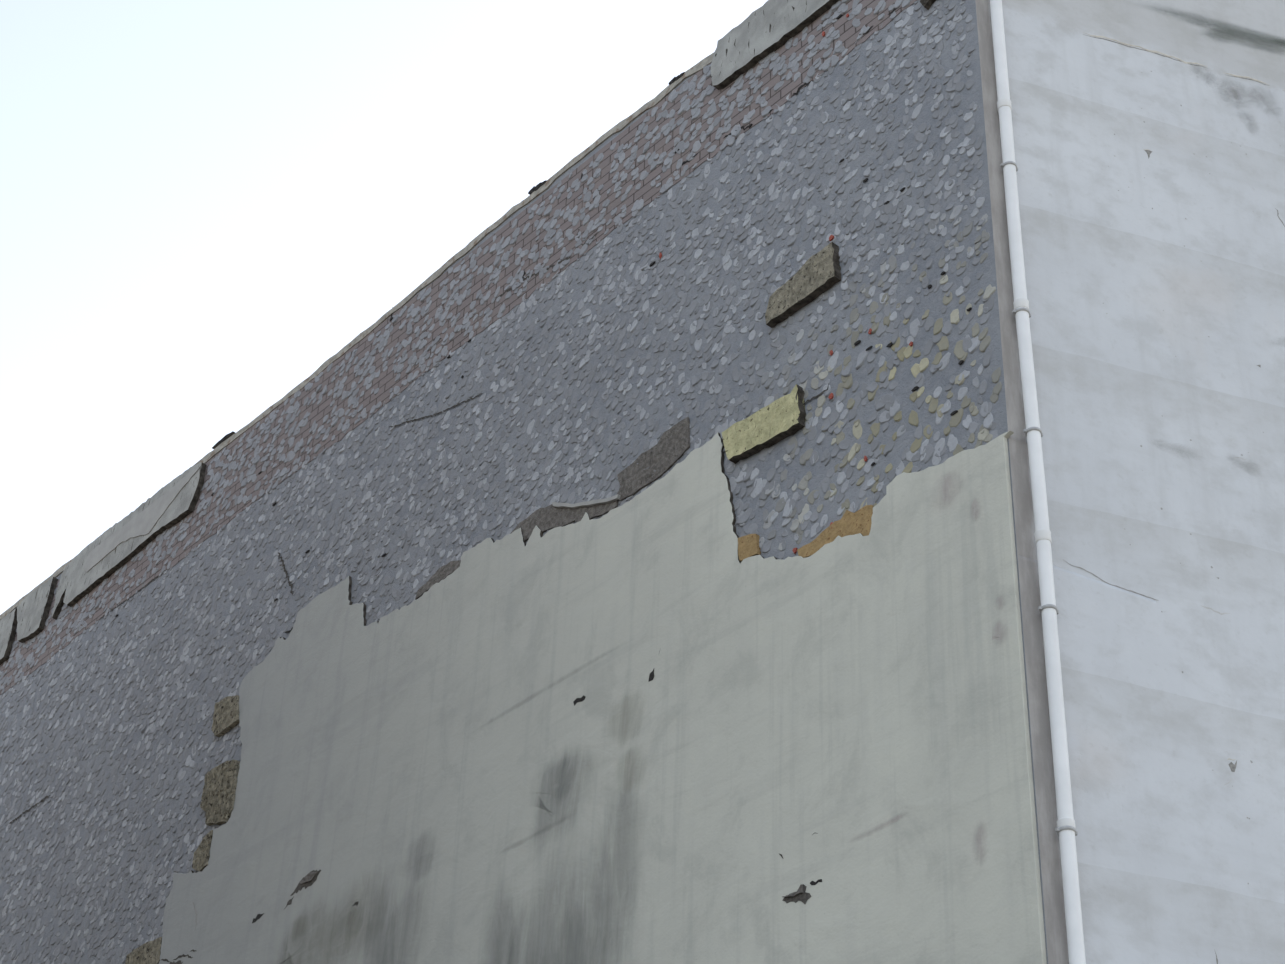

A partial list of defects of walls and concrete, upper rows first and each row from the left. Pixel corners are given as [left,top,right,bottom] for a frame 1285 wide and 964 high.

peeling [0,0,1002,964]
crack [1083,32,1285,90]